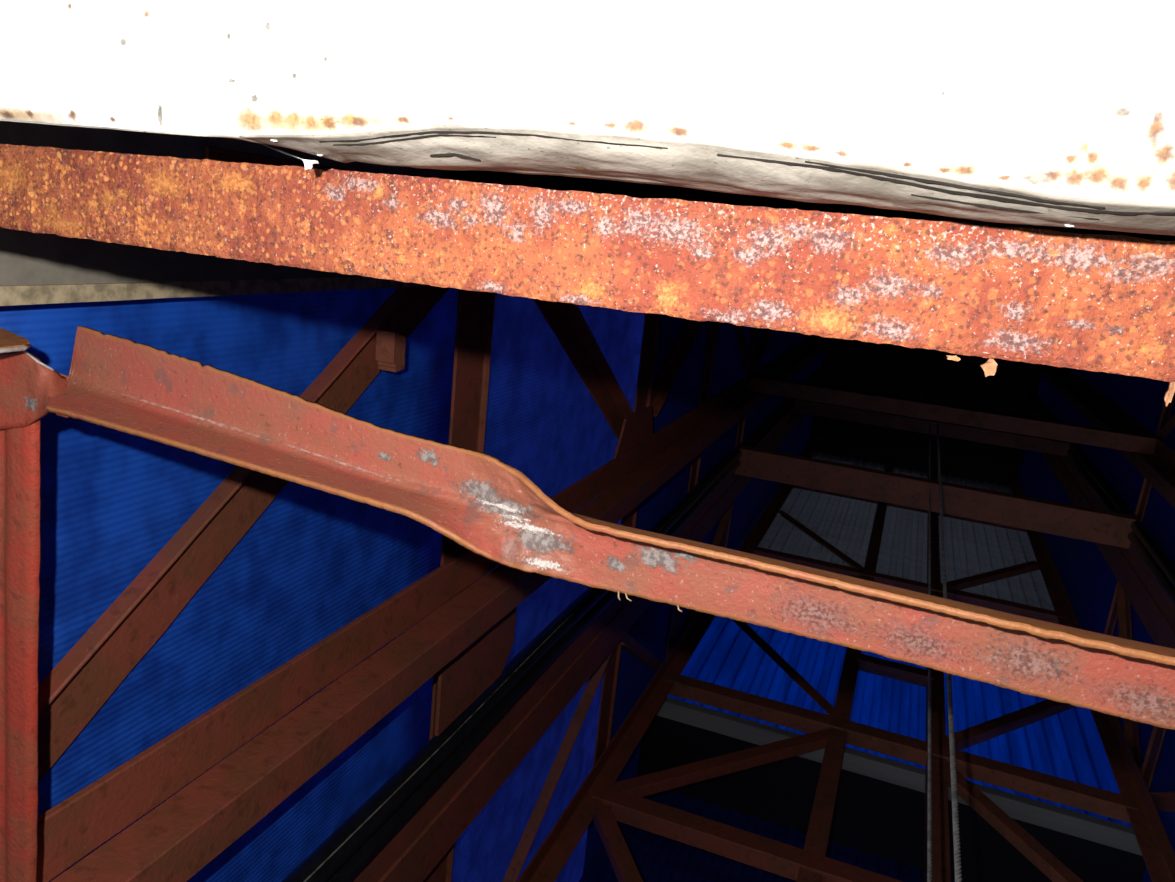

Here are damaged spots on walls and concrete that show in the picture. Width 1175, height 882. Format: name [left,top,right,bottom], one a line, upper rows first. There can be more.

corrosion [243,94,408,132]
corrosion [604,117,687,136]
corrosion [1023,111,1175,194]
corrosion [143,172,188,197]
corrosion [211,172,256,193]
corrosion [938,164,1009,180]
corrosion [86,189,131,211]
corrosion [653,285,678,309]
corrosion [797,305,857,333]
corrosion [980,358,998,377]
peeling [457,478,573,572]
peeling [606,546,697,574]